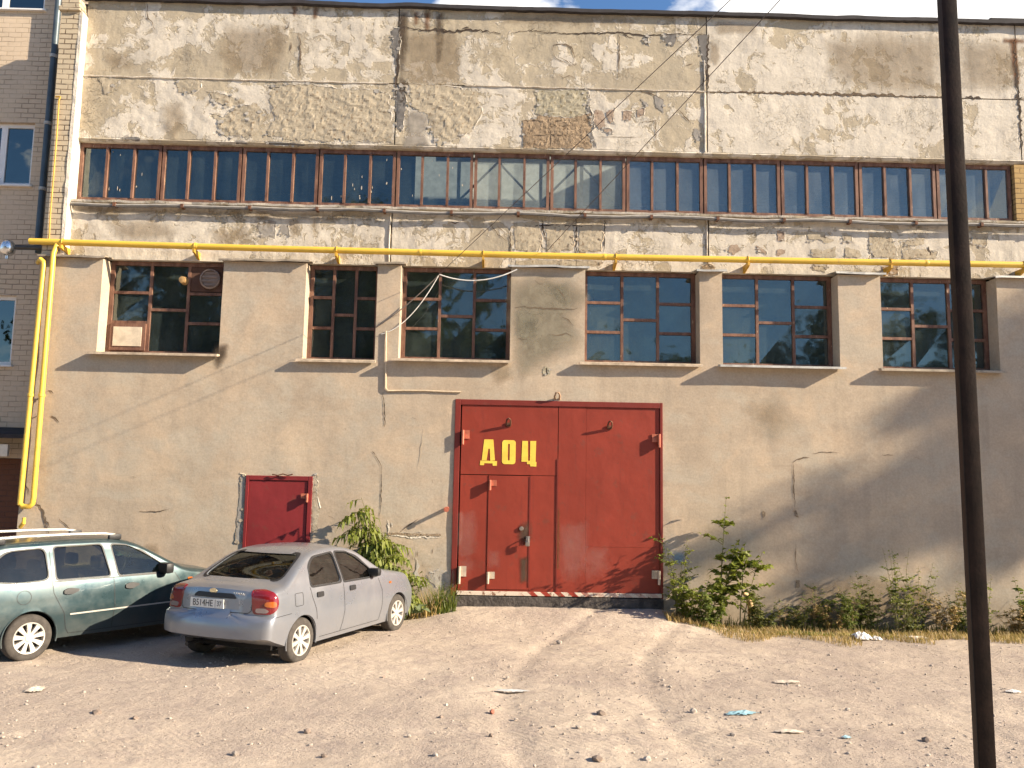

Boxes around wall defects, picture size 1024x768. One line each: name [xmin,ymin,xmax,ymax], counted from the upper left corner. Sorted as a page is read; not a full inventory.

crack [395,15,710,99]
peeling [643,32,679,47]
peeling [175,78,266,145]
peeling [393,83,483,148]
spalling [521,87,666,151]
crack [640,90,690,143]
peeling [511,219,605,266]
peeling [756,229,787,256]
peeling [807,230,939,276]
peeling [970,230,992,248]
crack [793,452,836,516]